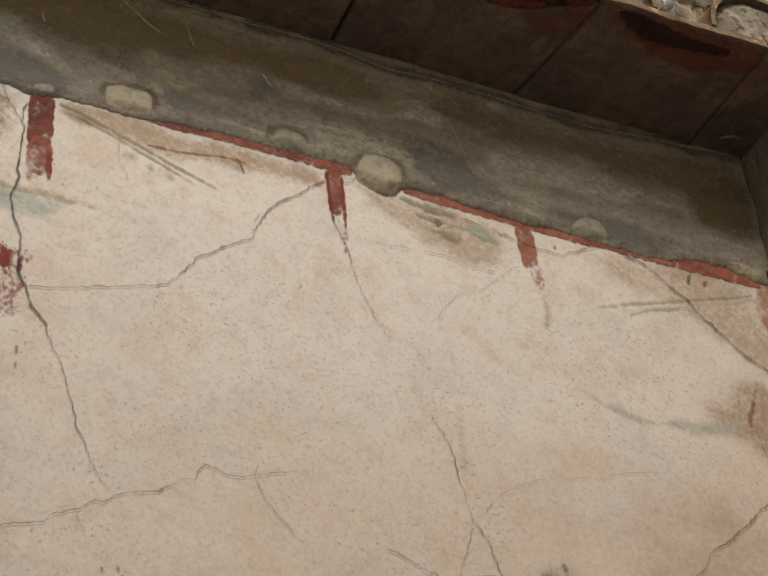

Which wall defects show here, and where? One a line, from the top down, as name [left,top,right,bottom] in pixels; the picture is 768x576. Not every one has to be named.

damp [0,0,753,238]
crack [8,98,48,335]
crack [210,181,324,254]
crack [624,254,768,371]
crack [59,376,164,513]
crack [697,505,768,576]